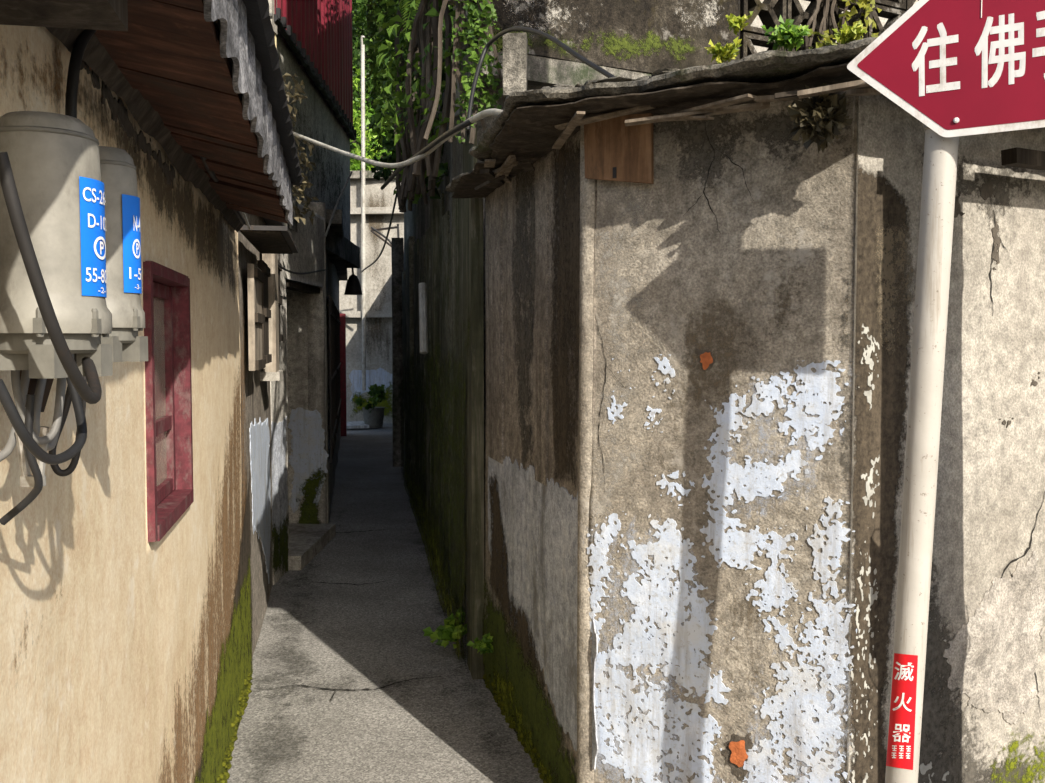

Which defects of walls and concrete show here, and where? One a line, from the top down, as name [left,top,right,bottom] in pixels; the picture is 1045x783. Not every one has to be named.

water stain [4,41,240,303]
crack [989,199,1008,302]
water stain [229,471,253,672]
peeling [488,324,880,783]
crack [1001,492,1045,578]